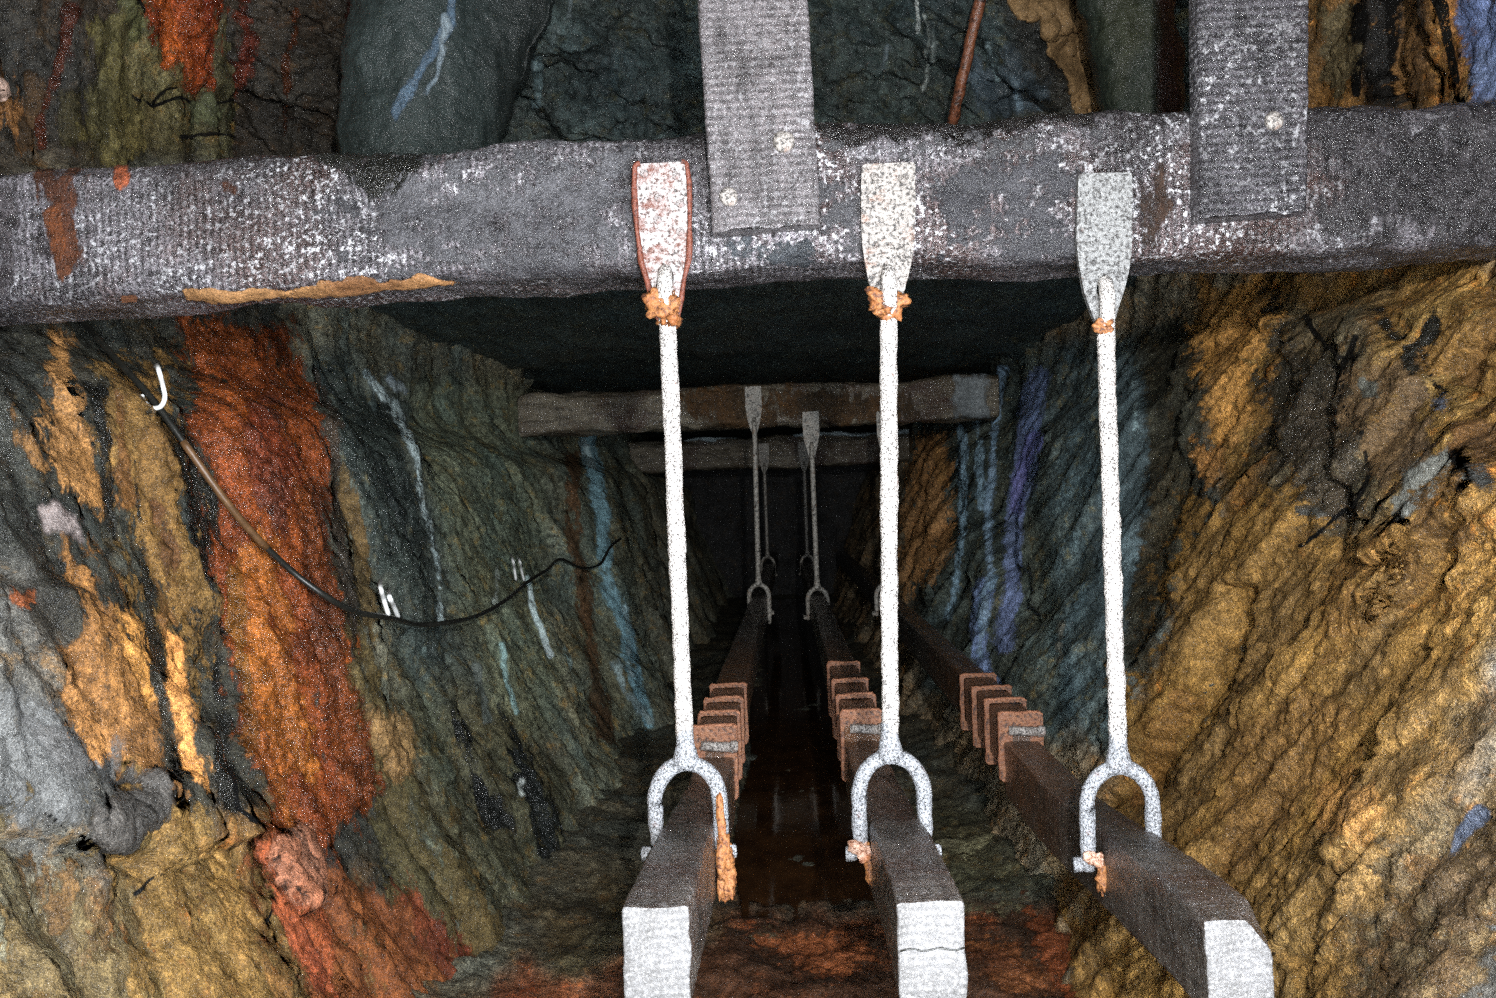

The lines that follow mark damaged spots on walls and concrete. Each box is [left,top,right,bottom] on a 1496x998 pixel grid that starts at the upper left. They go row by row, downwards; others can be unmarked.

rust [34,1,83,150]
rust [129,0,260,102]
rust [33,167,90,281]
rust [113,165,131,191]
rust [222,180,237,195]
rust [631,159,693,329]
rust [864,286,912,321]
rust [715,792,737,903]
rust [847,839,872,887]
rust [1082,850,1107,897]